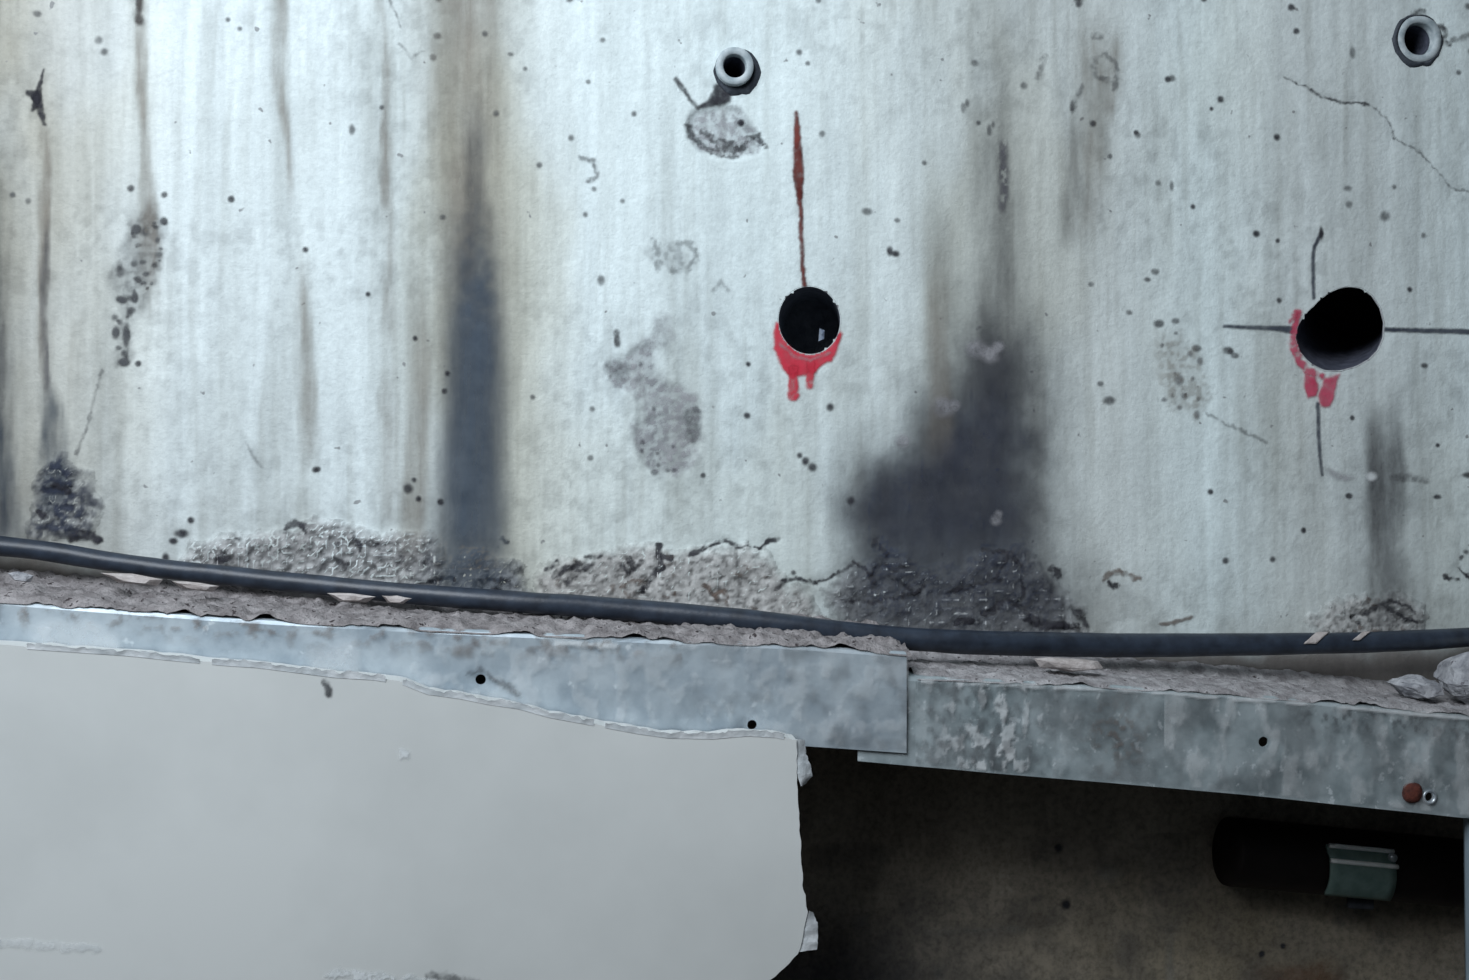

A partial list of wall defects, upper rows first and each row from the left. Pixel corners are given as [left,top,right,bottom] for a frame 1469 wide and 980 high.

crack [1296,83,1403,143]
damp [445,229,502,577]
damp [853,347,1037,607]